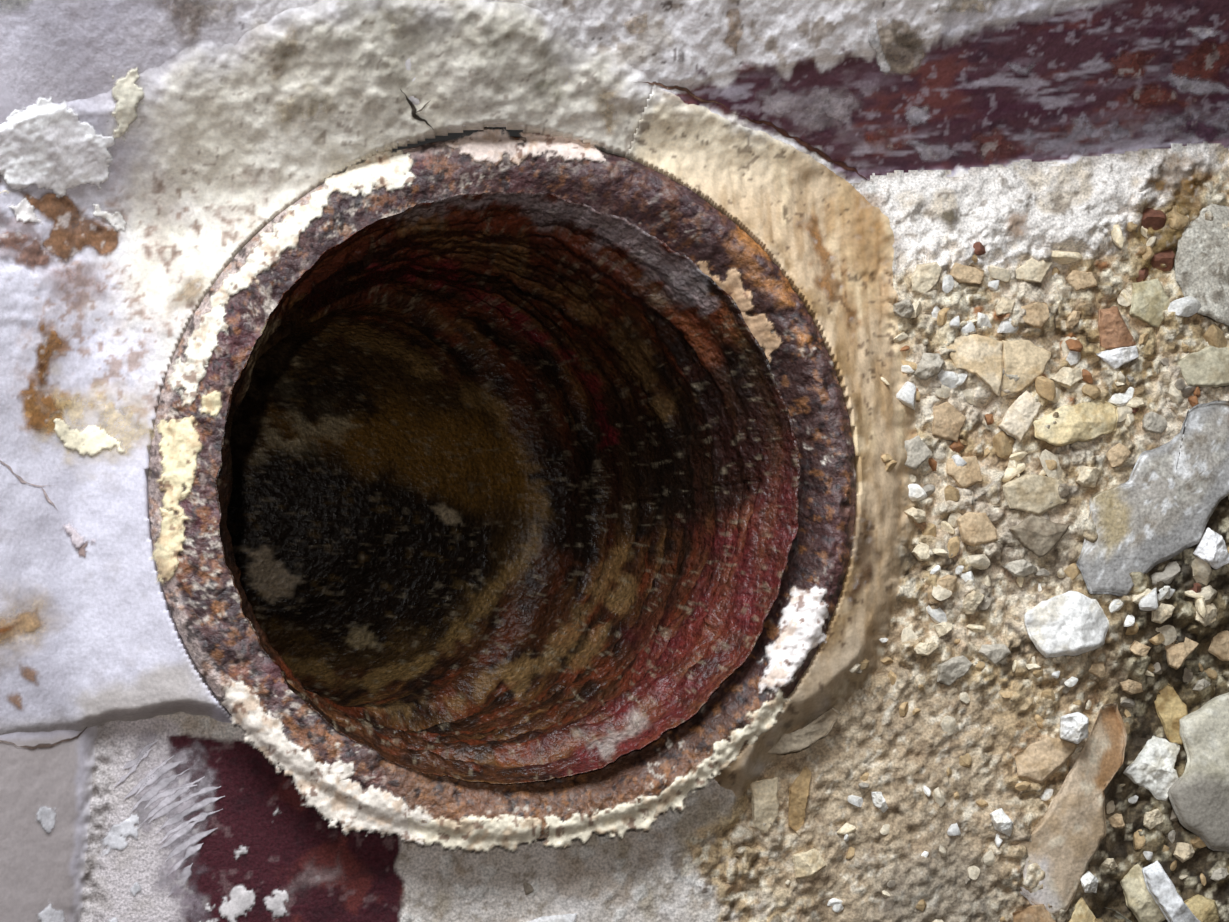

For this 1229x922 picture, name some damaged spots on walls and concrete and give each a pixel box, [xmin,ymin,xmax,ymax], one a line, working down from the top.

spalling [868,19,924,73]
flaking render [0,180,126,279]
rust [808,217,841,297]
rust [21,323,69,434]
spalling [1097,346,1139,369]
peeling [54,418,125,456]
crack [0,460,57,509]
spalling [1193,527,1229,569]
rust [850,564,872,601]
rust [0,611,41,641]
crack [0,727,87,750]
peeling [1154,684,1188,744]